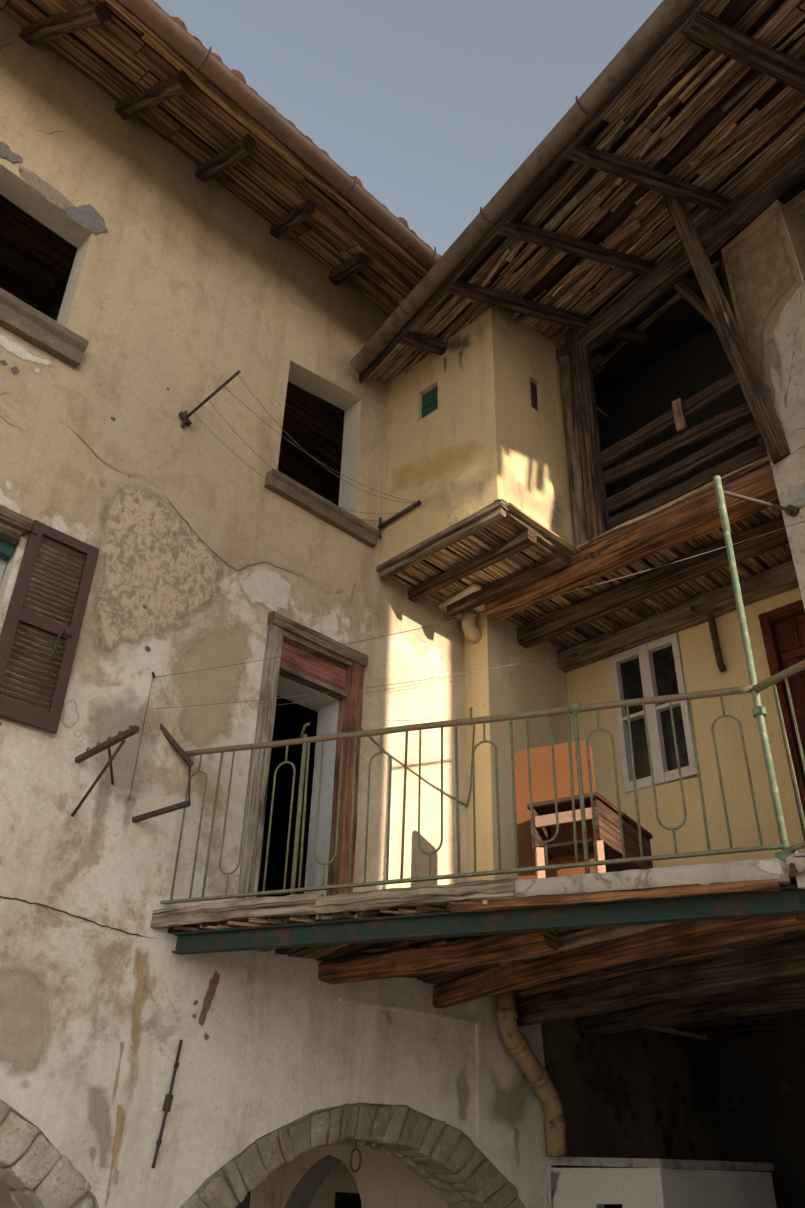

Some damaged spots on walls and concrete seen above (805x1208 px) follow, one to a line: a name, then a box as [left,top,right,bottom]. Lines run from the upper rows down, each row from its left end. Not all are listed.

peeling [0,333,52,373]
peeling [0,488,22,514]
crack [162,491,302,576]
peeling [95,485,223,652]
peeling [238,567,292,612]
flaking render [173,623,251,756]
crack [0,896,155,938]